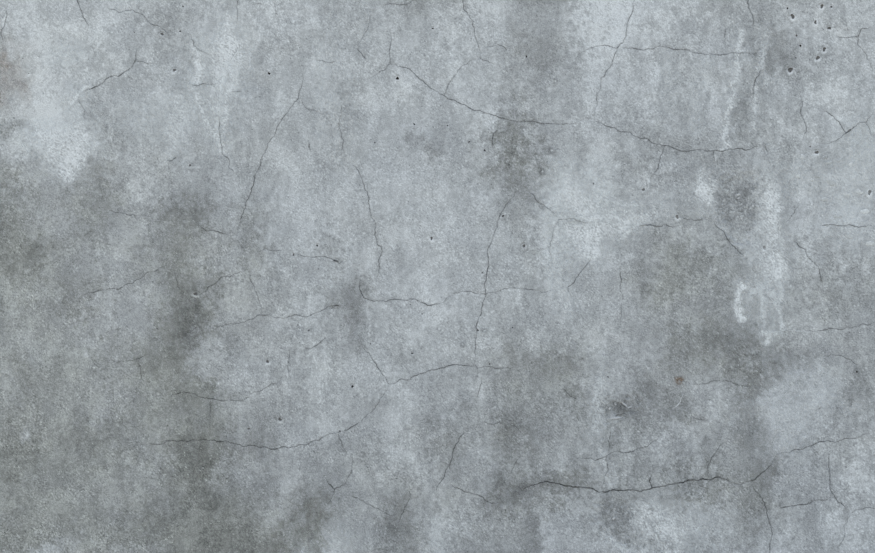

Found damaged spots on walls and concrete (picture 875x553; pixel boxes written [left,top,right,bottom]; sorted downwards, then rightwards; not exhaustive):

water stain [692,168,717,213]
water stain [733,169,790,346]
crack [535,448,728,493]